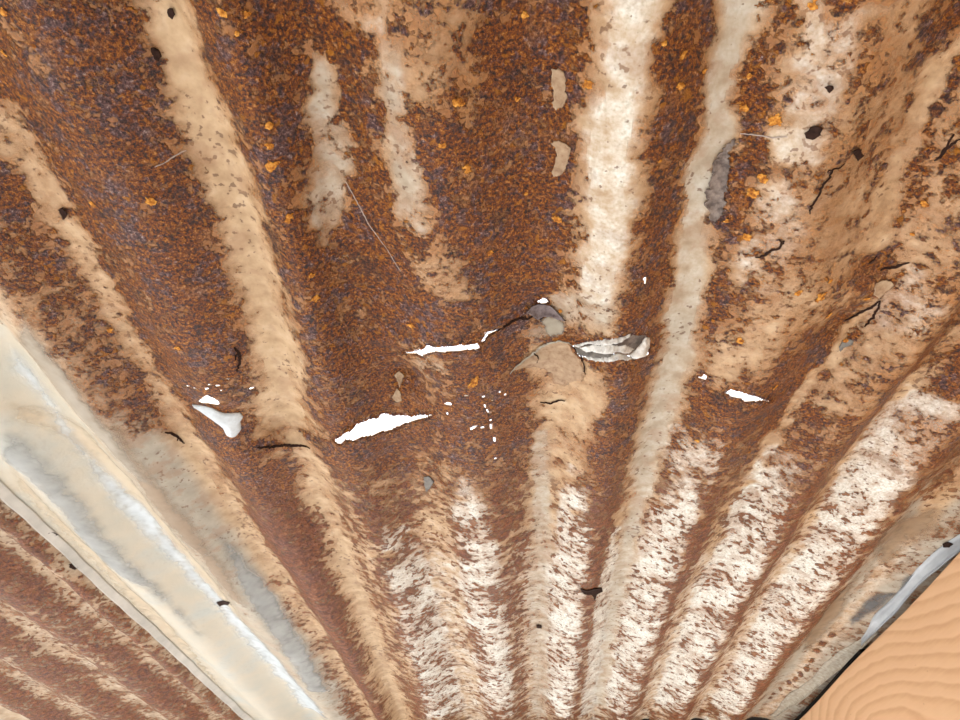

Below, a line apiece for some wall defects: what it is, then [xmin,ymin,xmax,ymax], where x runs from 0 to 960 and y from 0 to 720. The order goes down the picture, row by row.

peeling [704,139,738,224]
crack [809,163,845,214]
rust [0,0,392,720]
rust [189,0,718,720]
peeling [527,304,566,336]
rust [595,0,960,720]
crack [845,300,881,327]
crack [257,442,310,450]